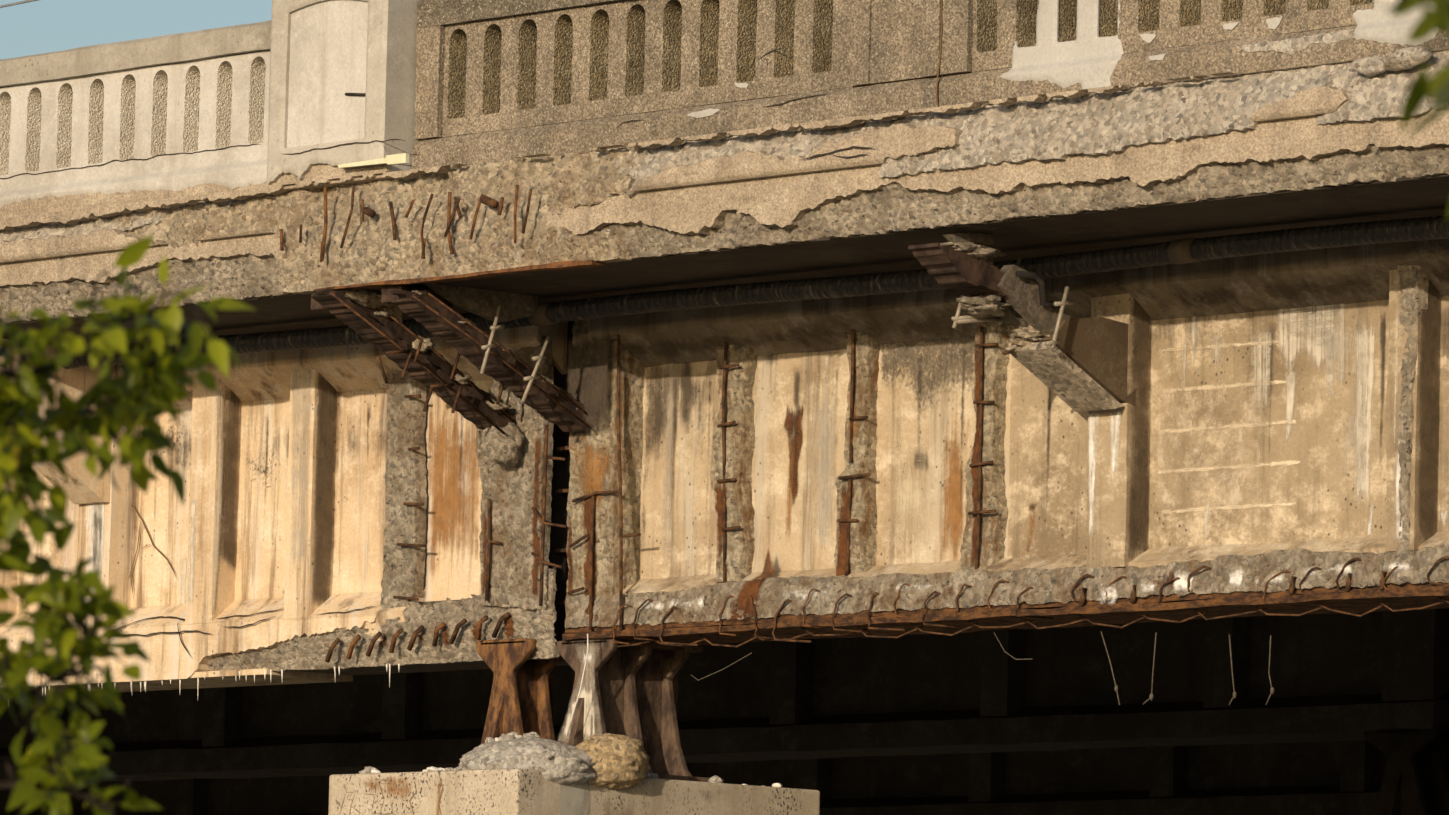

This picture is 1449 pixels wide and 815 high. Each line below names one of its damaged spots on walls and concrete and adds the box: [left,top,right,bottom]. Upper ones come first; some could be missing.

spalling [0,17,1449,324]
corrosion [531,440,540,596]
corrosion [730,551,775,621]
corrosion [784,406,803,529]
spalling [207,265,1449,672]
corrosion [836,485,855,576]
leakage [1173,574,1193,591]
leakage [1089,277,1402,557]
leakage [1230,571,1282,585]
leakage [1419,270,1449,540]